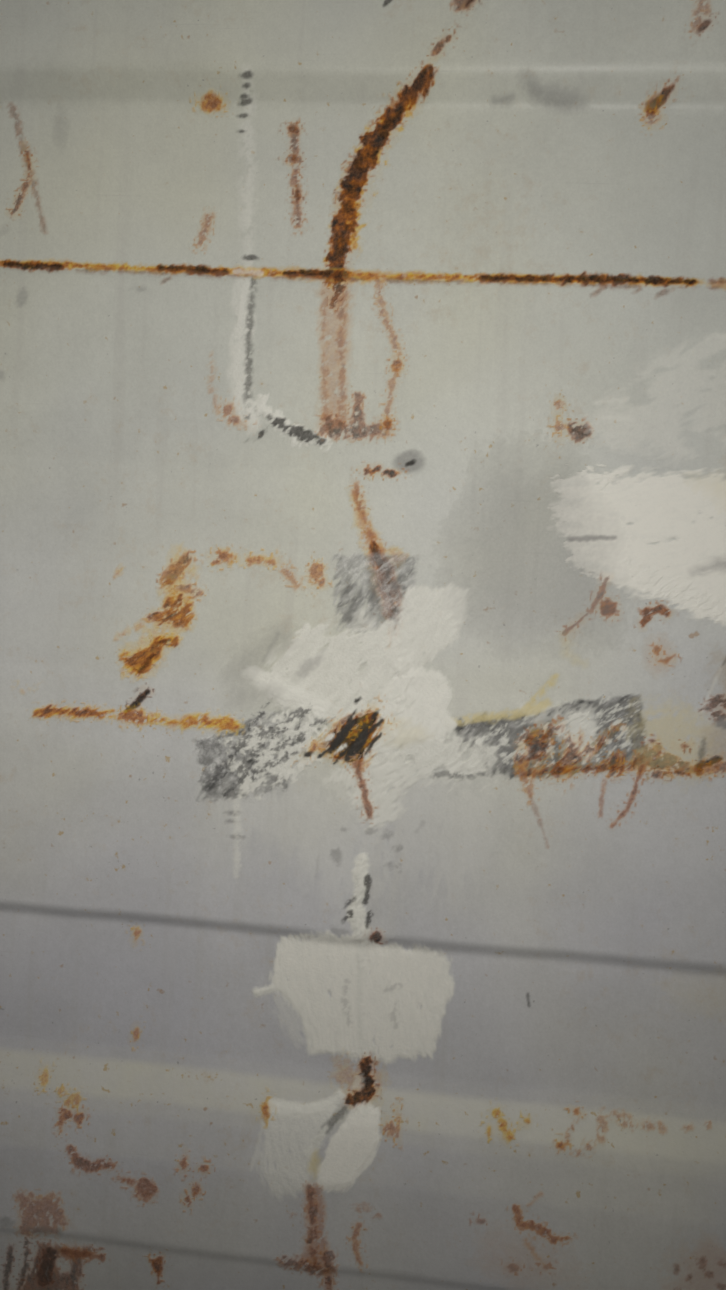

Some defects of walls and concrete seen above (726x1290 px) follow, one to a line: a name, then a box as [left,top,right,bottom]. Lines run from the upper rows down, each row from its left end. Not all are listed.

corrosion [634,69,685,137]
corrosion [277,0,488,446]
corrosion [9,540,335,738]
corrosion [510,599,726,850]
corrosion [0,1056,217,1290]
corrosion [272,1179,384,1290]
corrosion [327,1046,409,1152]